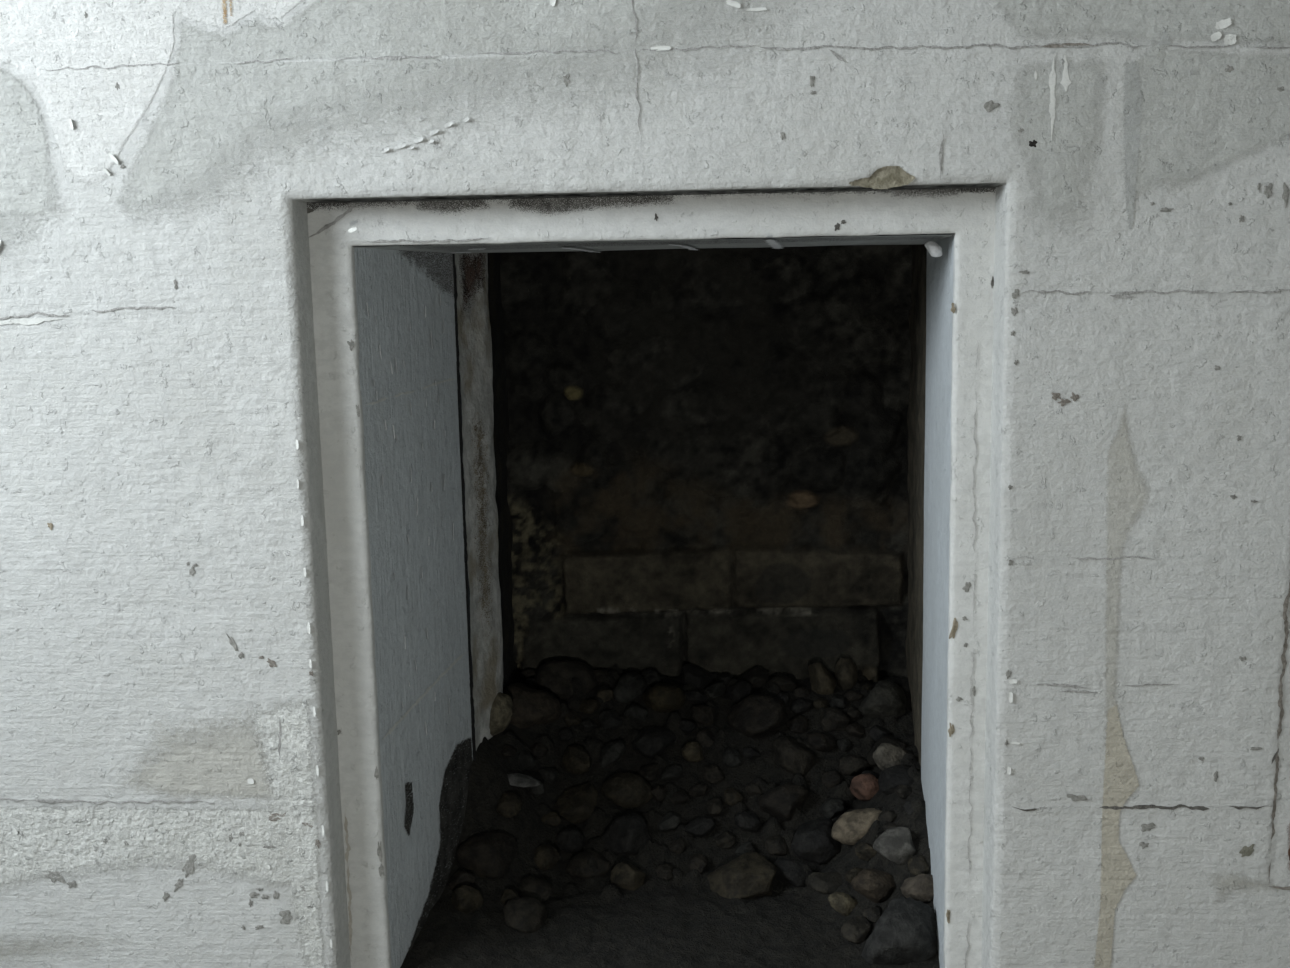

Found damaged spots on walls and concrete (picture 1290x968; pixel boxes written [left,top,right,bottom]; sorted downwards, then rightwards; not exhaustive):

peeling [1257,182,1290,208]
crack [1018,289,1290,298]
crack [0,304,198,325]
crack [1076,554,1184,562]
leakage [1094,402,1152,968]
crack [1014,583,1290,890]
crack [0,797,316,807]